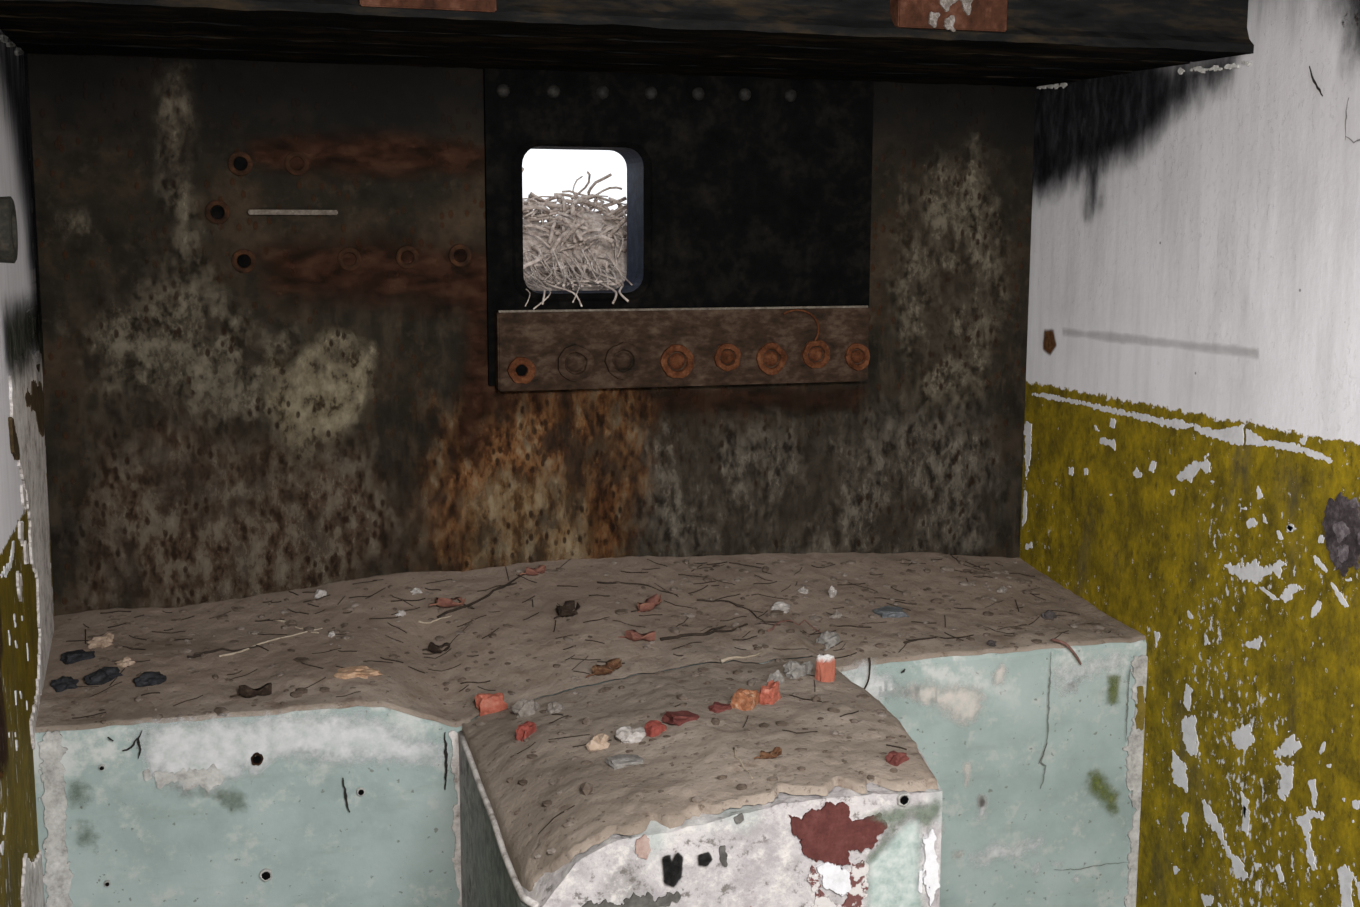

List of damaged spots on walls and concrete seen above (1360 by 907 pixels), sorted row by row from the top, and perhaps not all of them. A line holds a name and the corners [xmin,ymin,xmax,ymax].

water stain [6,300,44,375]
corrosion [425,258,646,572]
peeling [1032,393,1333,496]
flaking render [0,351,74,907]
peeling [1224,559,1303,603]
flaking render [1313,492,1360,608]
peeling [789,802,940,907]
flaking render [1056,631,1160,907]
peeling [1171,684,1201,793]
peeling [1231,724,1255,751]
peeling [1181,731,1325,891]
peeling [1337,864,1360,907]